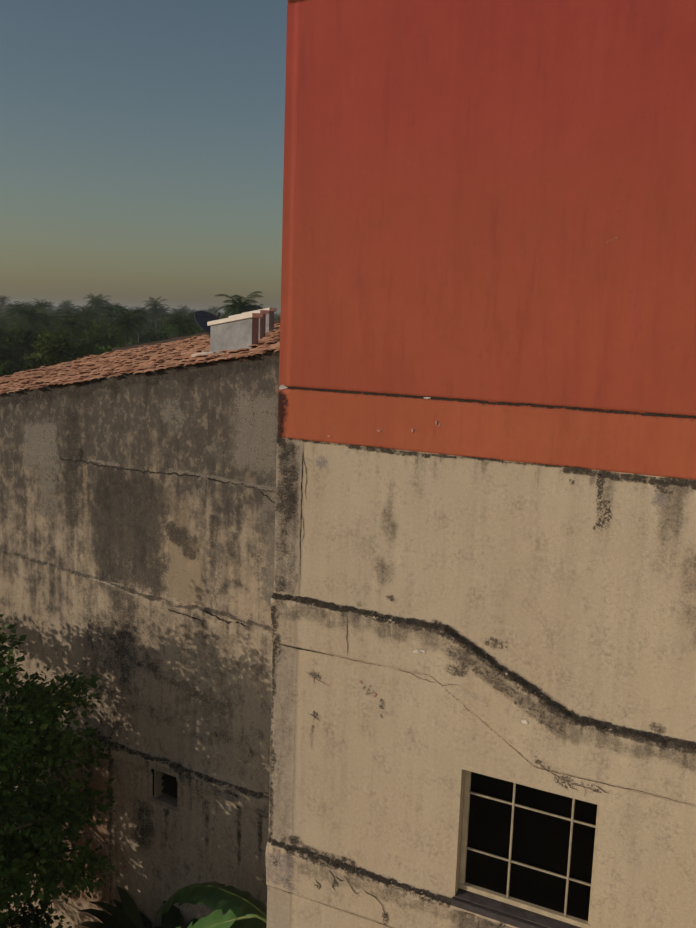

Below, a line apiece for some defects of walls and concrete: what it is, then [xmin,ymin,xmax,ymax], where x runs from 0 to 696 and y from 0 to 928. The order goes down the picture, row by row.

crack [21,448,276,504]
crack [299,444,307,561]
damp [0,351,696,928]
crack [281,618,696,805]
crack [283,872,391,928]